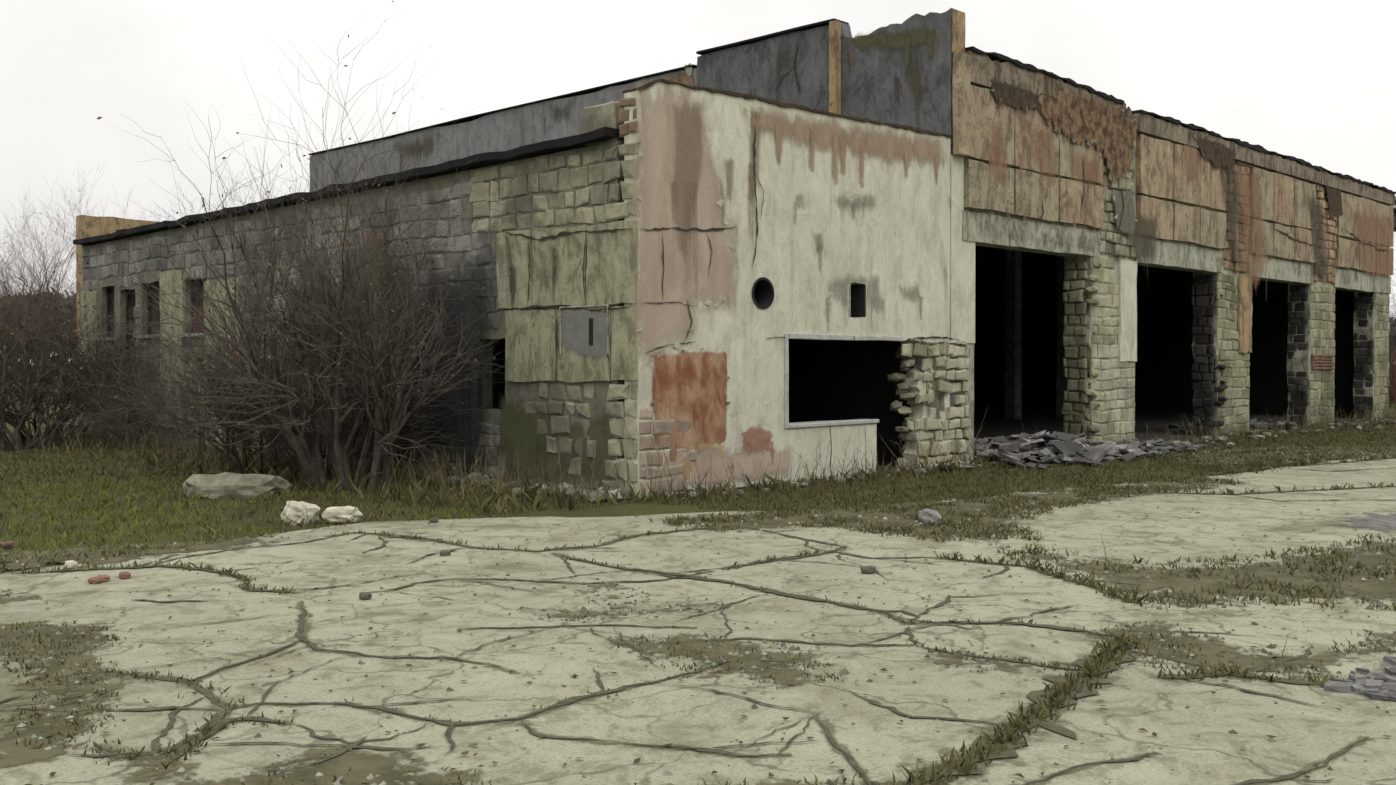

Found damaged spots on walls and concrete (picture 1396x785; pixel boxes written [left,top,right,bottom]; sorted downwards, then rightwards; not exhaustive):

crack [775,43,800,95]
rust [744,108,941,187]
spalling [991,79,1138,235]
spalling [1193,130,1237,172]
crack [500,122,764,381]
flaking render [633,63,737,361]
crack [910,334,958,342]
spalling [901,339,971,464]
flaking render [662,448,791,489]
crack [0,526,1321,785]
crack [1235,735,1373,785]